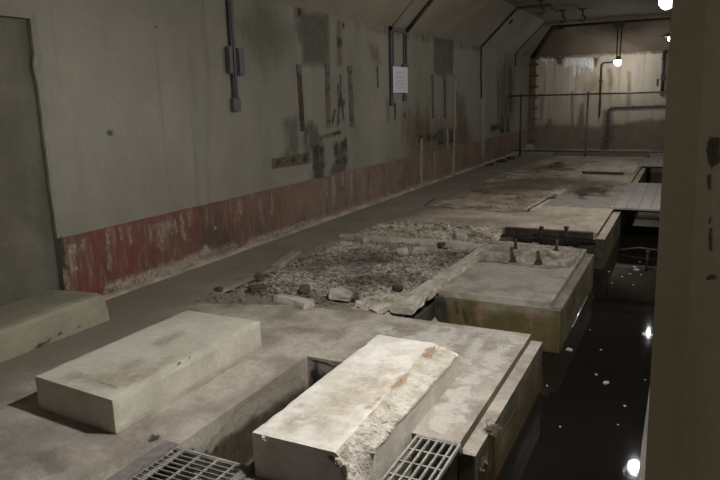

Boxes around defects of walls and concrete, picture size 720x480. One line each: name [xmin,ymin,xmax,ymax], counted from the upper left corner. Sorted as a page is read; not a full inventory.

leakage [304,76,347,178]
leakage [564,57,594,77]
peeling [104,171,354,294]
spalling [328,346,458,480]